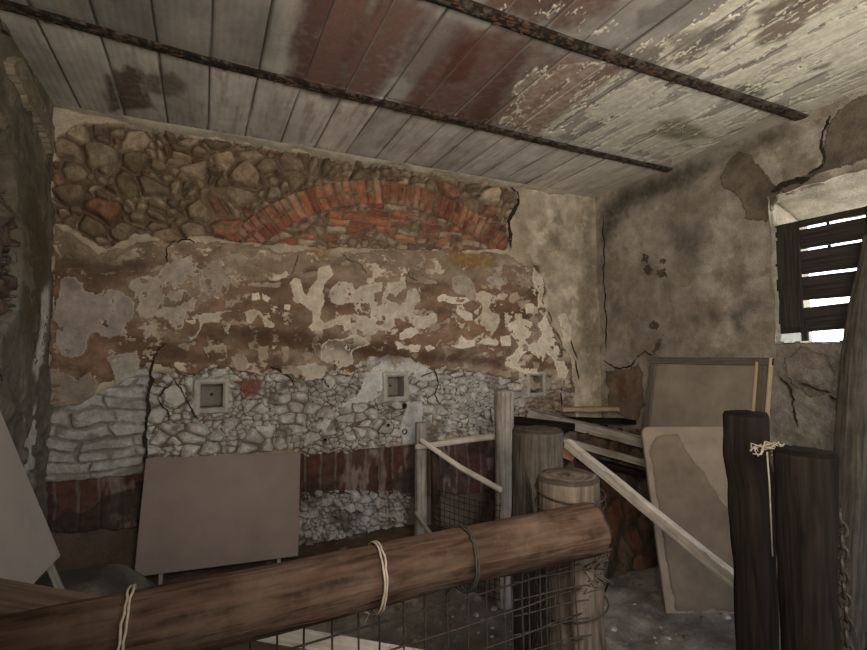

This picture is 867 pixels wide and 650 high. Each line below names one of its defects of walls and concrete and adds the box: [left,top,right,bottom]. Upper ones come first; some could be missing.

water stain [107,66,182,110]
peeling [490,0,867,222]
peeling [0,56,576,546]
crack [602,220,652,369]
crack [779,376,836,427]